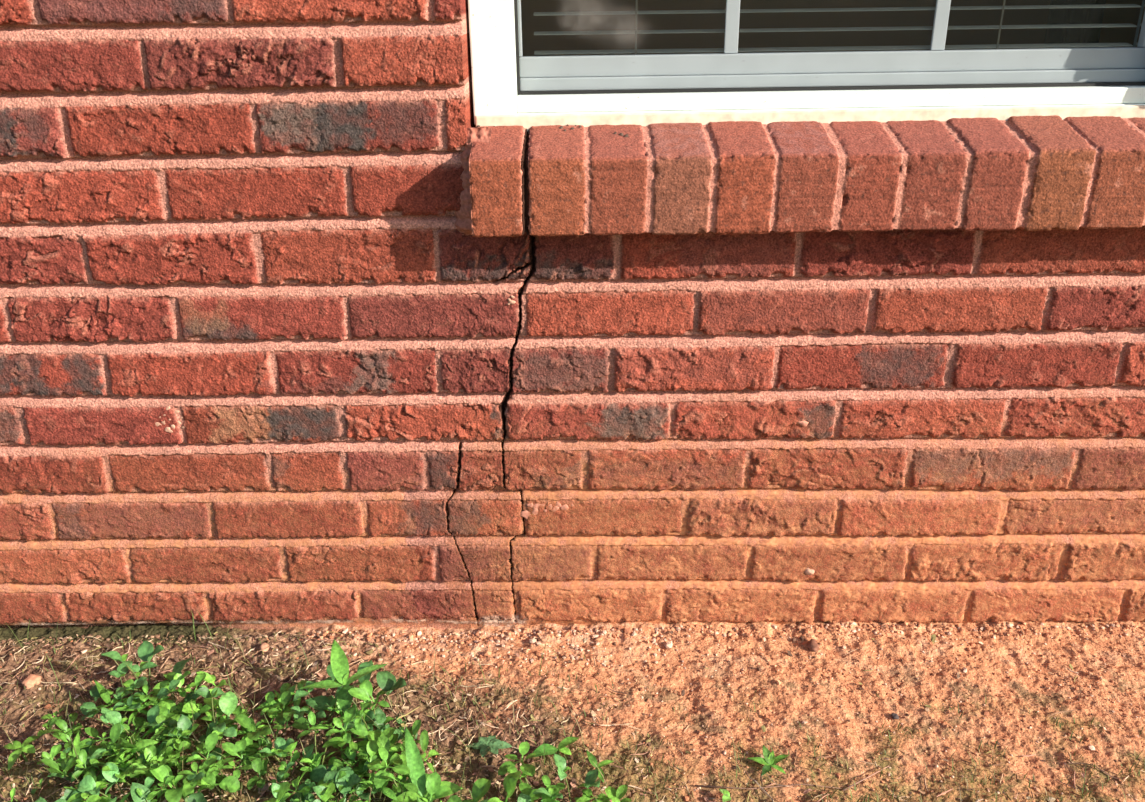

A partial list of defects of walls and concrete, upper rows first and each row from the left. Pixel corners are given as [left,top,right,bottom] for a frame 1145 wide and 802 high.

crack [446,444,478,621]
crack [496,128,536,621]